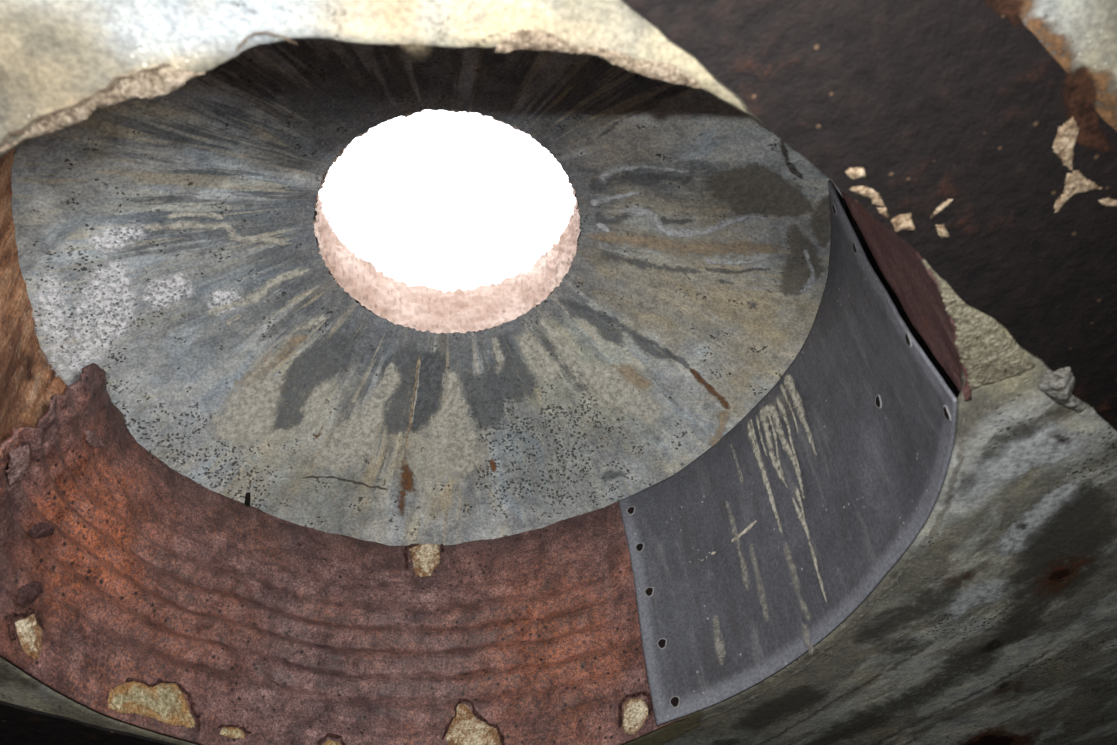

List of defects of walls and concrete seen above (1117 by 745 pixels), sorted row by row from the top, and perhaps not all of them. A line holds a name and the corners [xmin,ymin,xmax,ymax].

rust [987,0,1117,151]
peeling [1052,116,1117,213]
peeling [845,167,915,232]
water stain [208,268,309,325]
water stain [561,299,675,360]
water stain [211,315,359,443]
water stain [313,319,670,476]
rust [16,581,43,607]
peeling [7,608,45,660]
peeling [107,678,201,731]
peeling [442,698,505,745]
peeling [618,691,652,735]